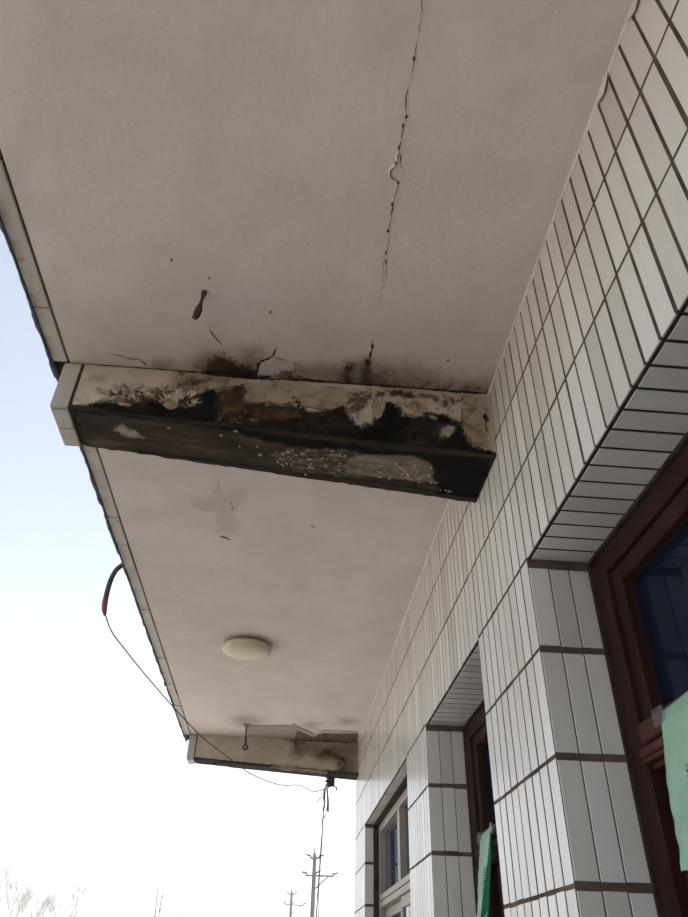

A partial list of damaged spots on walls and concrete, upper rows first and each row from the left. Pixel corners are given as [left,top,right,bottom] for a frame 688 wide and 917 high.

crack [379,0,423,302]
peeling [73,347,353,410]
peeling [114,424,144,438]
water stain [74,354,491,498]
peeling [371,401,385,419]
peeling [429,397,489,449]
spalling [256,446,452,492]
spalling [247,723,357,742]
water stain [202,740,358,780]